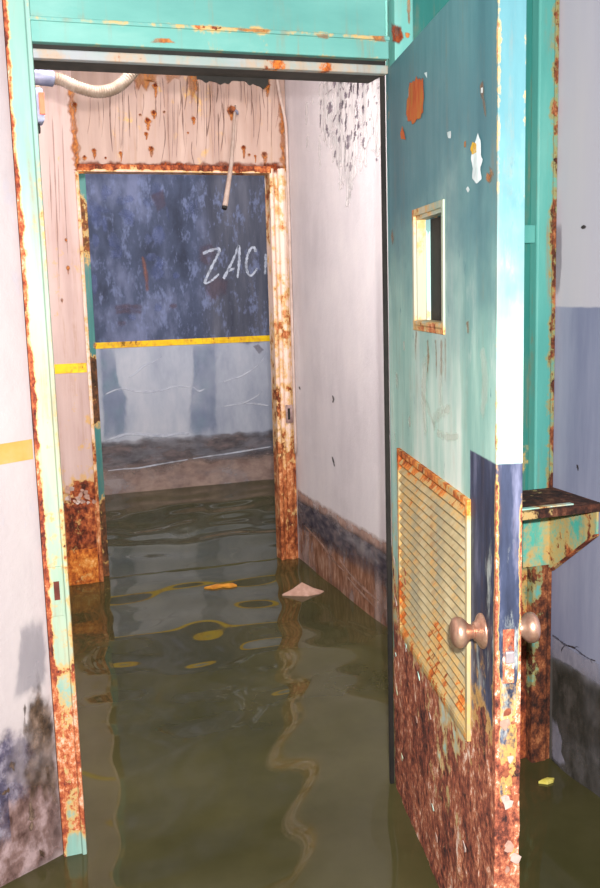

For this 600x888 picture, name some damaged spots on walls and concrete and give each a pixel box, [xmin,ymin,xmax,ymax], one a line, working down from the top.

corrosion [68,90,122,174]
corrosion [135,74,158,97]
corrosion [134,105,286,172]
corrosion [400,77,424,139]
peeling [466,134,483,192]
water stain [297,490,393,632]
water stain [552,638,600,797]
water stain [0,693,62,887]